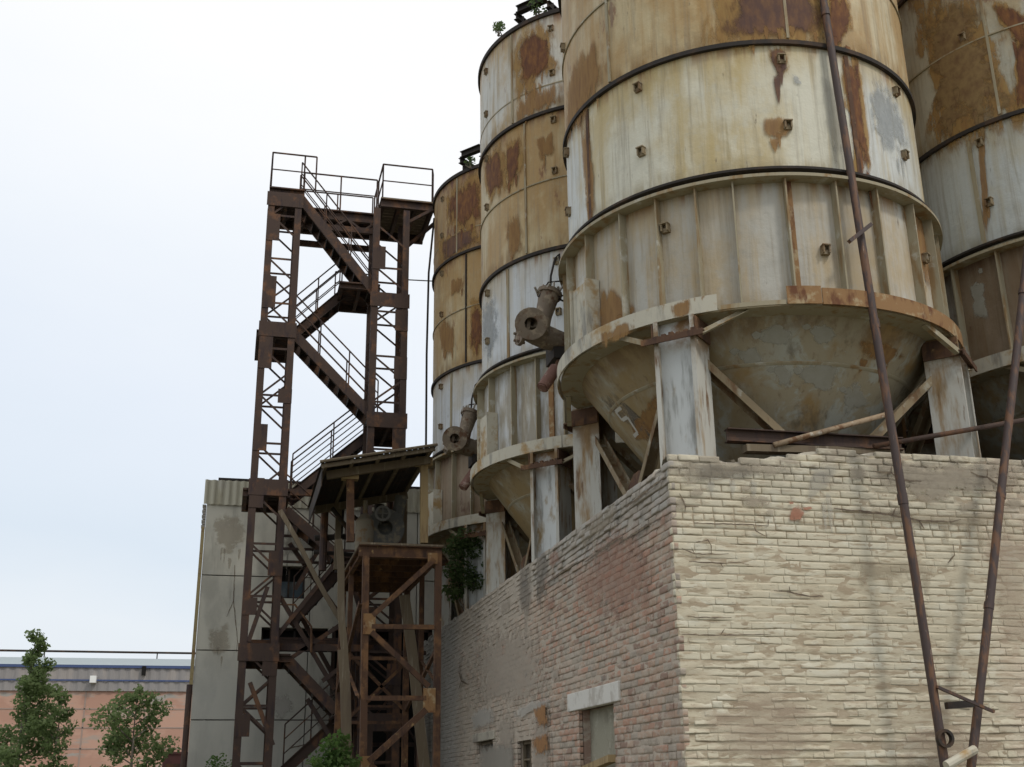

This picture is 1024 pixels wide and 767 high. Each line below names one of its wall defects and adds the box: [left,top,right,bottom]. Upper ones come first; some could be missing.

rust [439,140,524,264]
rust [513,25,602,220]
rust [702,0,871,175]
rust [910,0,1024,229]
flaking render [789,502,812,520]